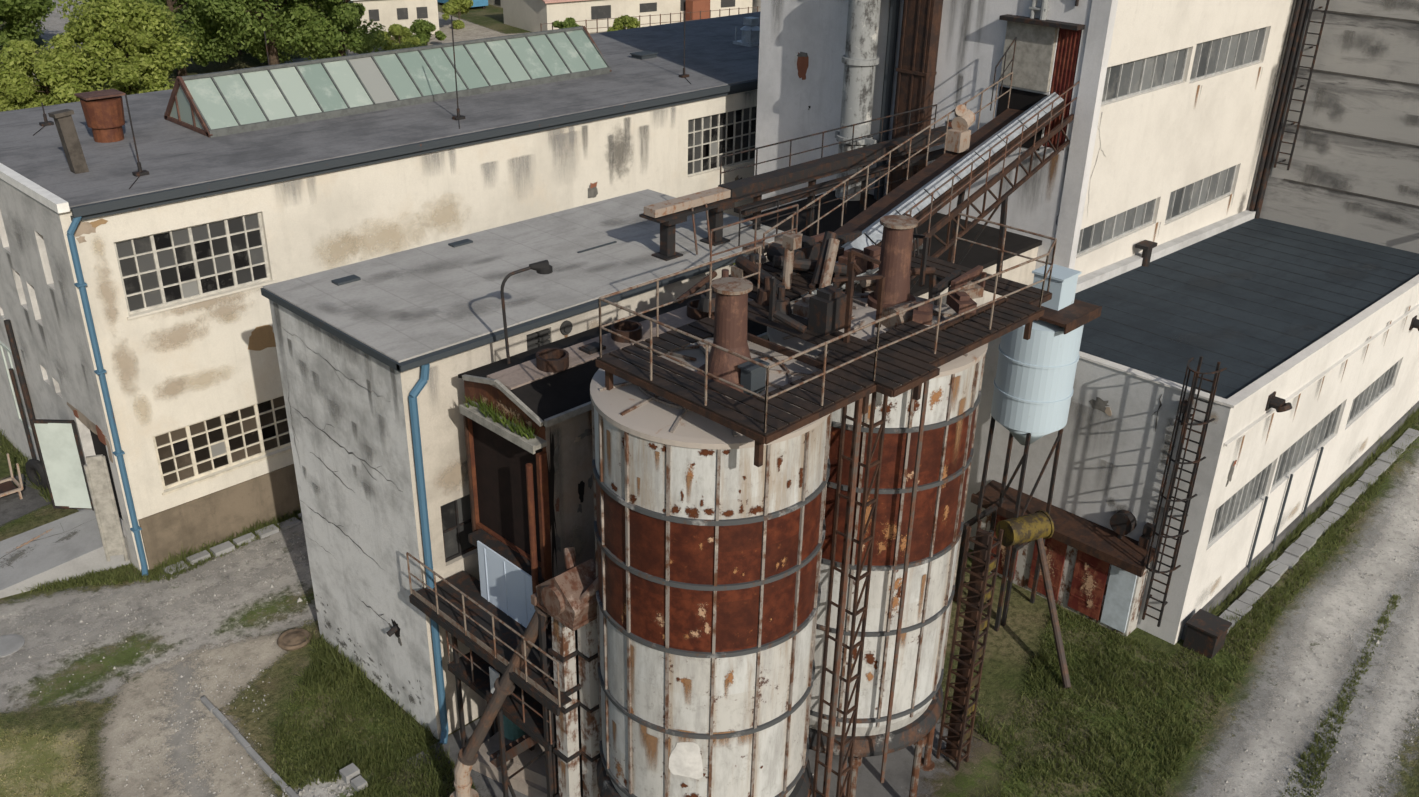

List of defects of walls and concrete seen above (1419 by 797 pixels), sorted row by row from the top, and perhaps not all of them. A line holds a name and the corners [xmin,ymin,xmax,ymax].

flaking render [74,219,108,251]
crack [286,375,400,492]
corrosion [601,419,640,503]
corrosion [662,449,764,519]
corrosion [862,376,966,488]
crack [303,502,382,569]
corrosion [889,578,902,612]
corrosion [919,574,927,613]
corrosion [851,647,878,681]